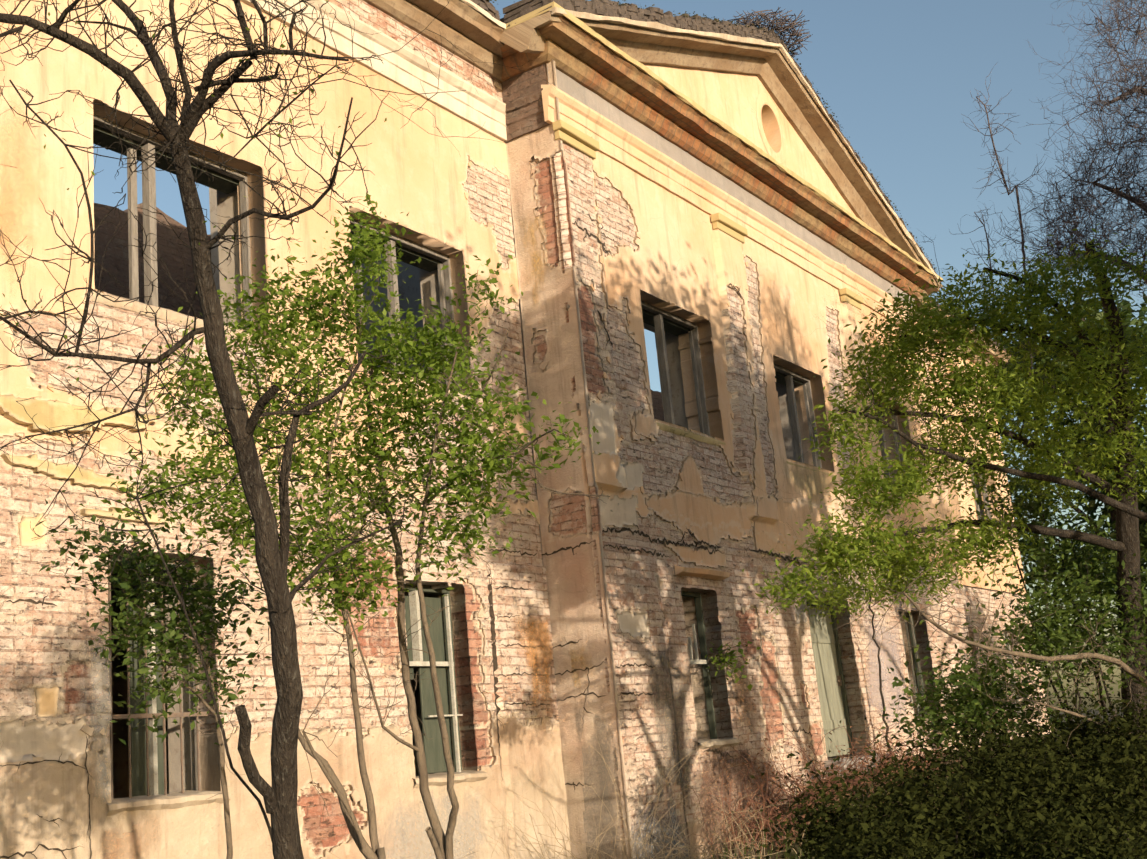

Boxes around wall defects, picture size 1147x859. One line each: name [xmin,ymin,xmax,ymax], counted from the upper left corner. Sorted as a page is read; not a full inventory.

spalling [531,143,779,505]